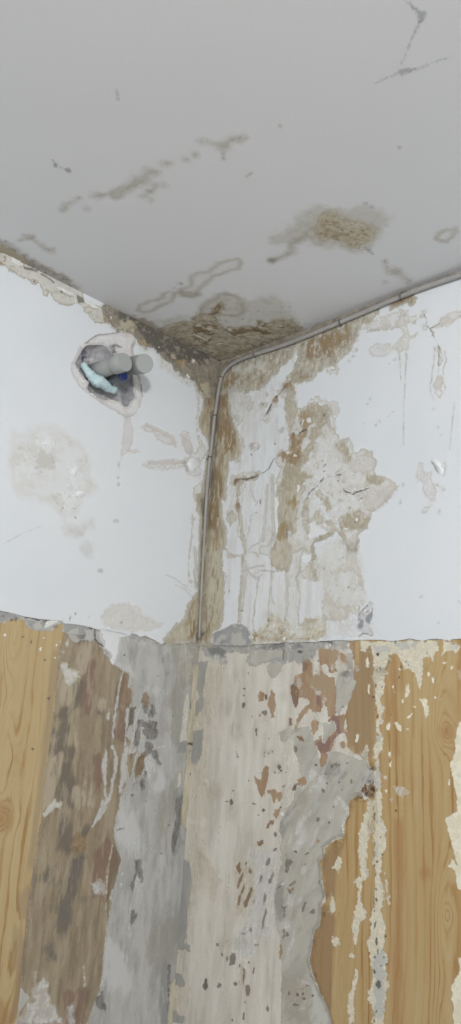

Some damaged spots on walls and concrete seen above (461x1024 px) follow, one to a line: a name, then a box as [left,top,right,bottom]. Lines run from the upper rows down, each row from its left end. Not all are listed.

damp [314,212,375,248]
peeling [0,252,143,417]
damp [102,270,461,647]
flaking render [0,611,49,631]
flaking render [63,601,461,1024]